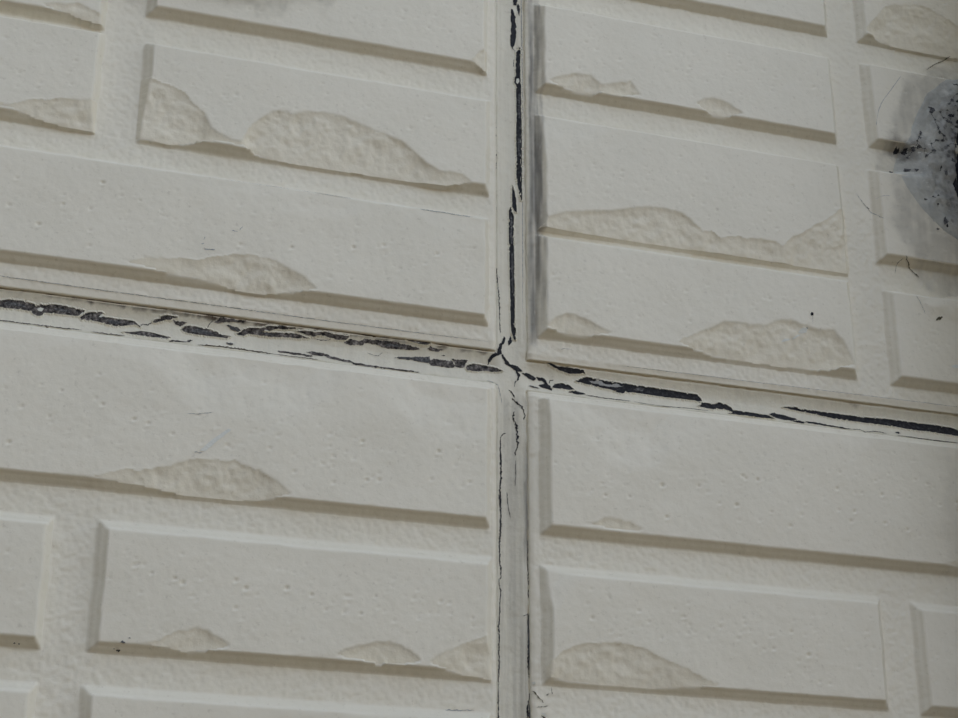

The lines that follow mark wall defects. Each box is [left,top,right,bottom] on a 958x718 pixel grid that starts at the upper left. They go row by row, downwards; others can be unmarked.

spalling [867,4,958,59]
spalling [0,98,97,132]
spalling [136,77,470,186]
spalling [553,74,639,96]
spalling [129,237,314,295]
crack [0,0,958,484]
spalling [543,207,850,276]
spalling [679,312,854,370]
spalling [95,458,289,501]
crack [497,433,510,718]
crack [523,543,531,718]
spalling [532,642,718,718]